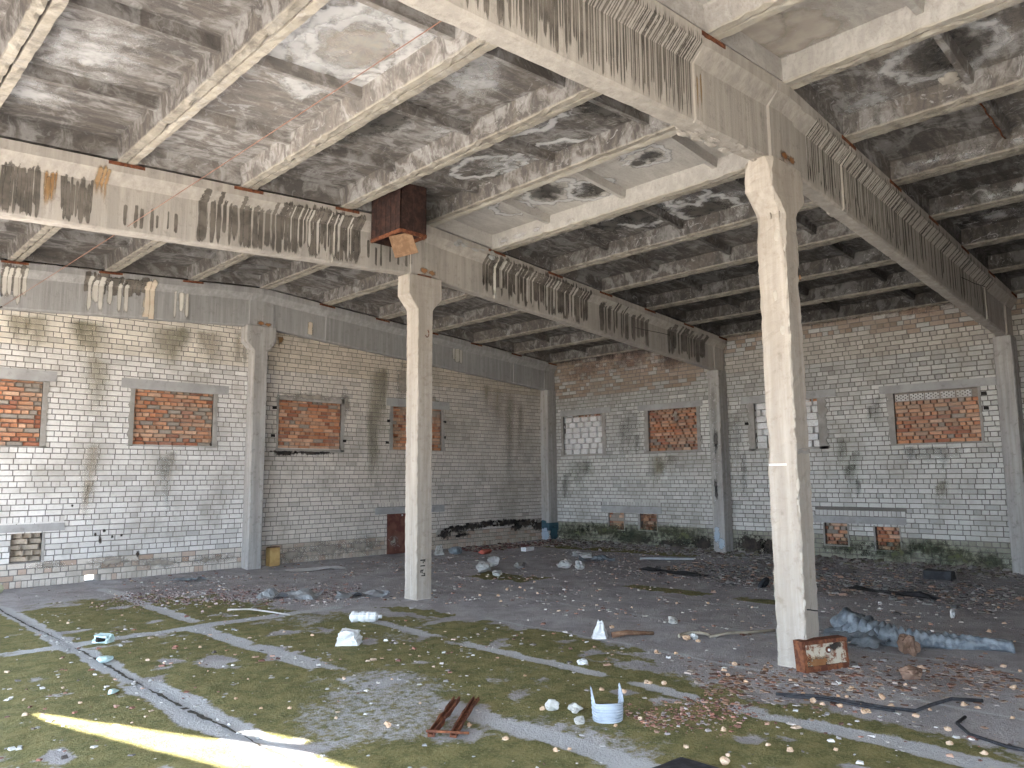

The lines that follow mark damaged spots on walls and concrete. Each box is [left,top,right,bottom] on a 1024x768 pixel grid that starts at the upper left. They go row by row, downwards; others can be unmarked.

leakage [269,0,434,87]
leakage [272,73,331,99]
leakage [511,113,587,147]
leakage [450,153,530,180]
leakage [620,144,672,168]
leakage [488,177,615,216]
leakage [593,189,746,234]